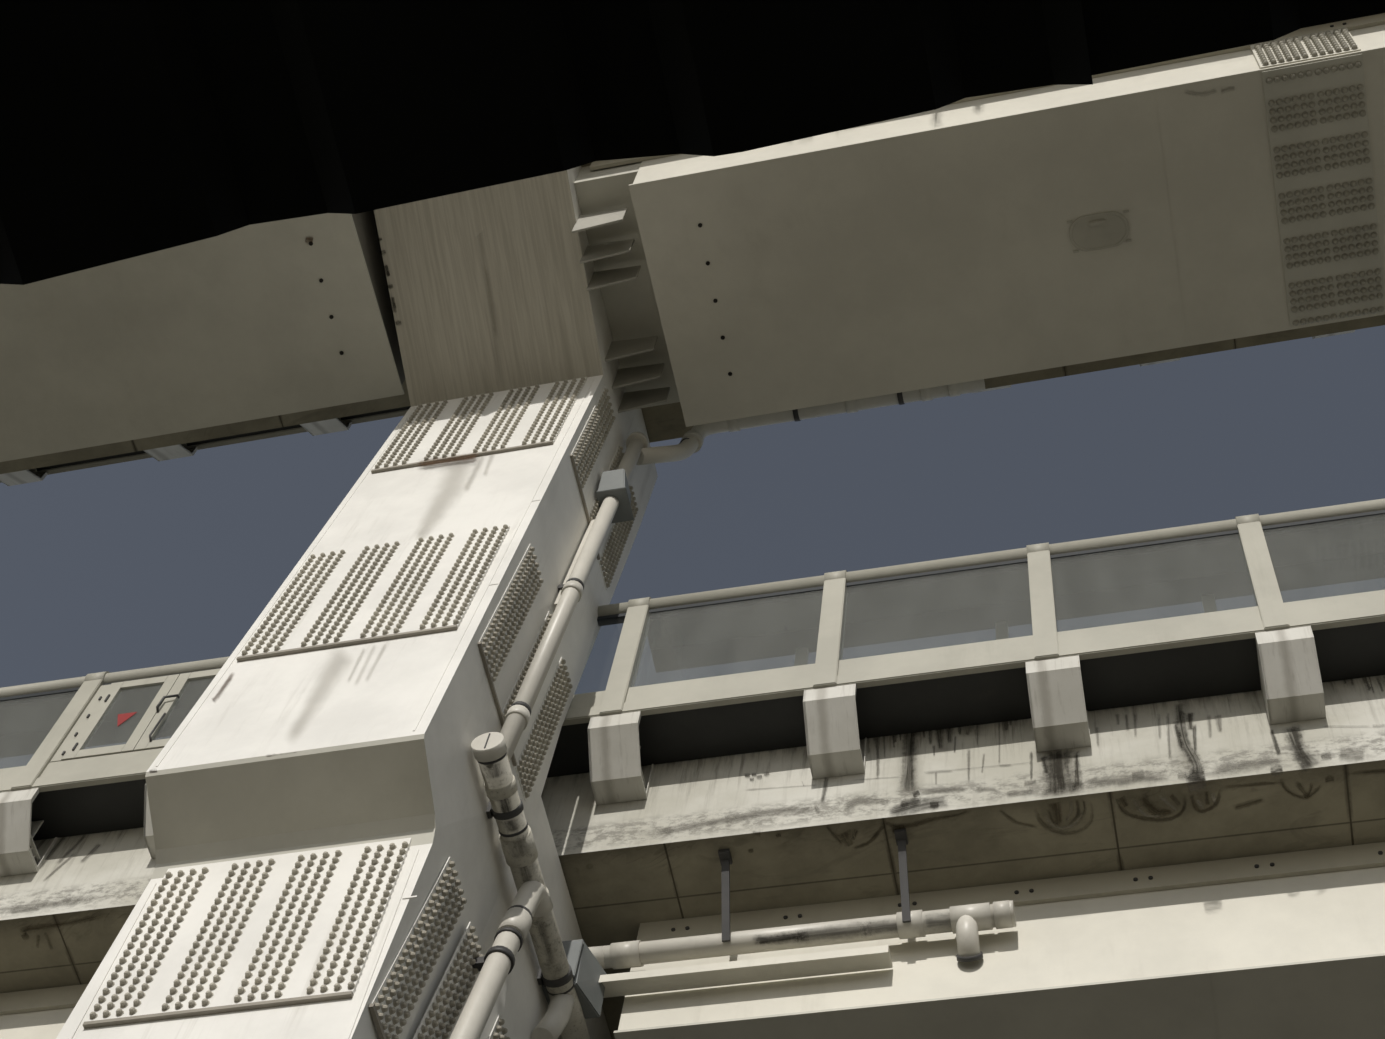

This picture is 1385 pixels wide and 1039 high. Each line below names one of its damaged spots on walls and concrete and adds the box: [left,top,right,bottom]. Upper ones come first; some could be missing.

leakage [868,725,984,797]
leakage [983,751,1218,823]
leakage [1175,706,1202,776]
leakage [1221,729,1385,798]
leakage [666,808,795,837]